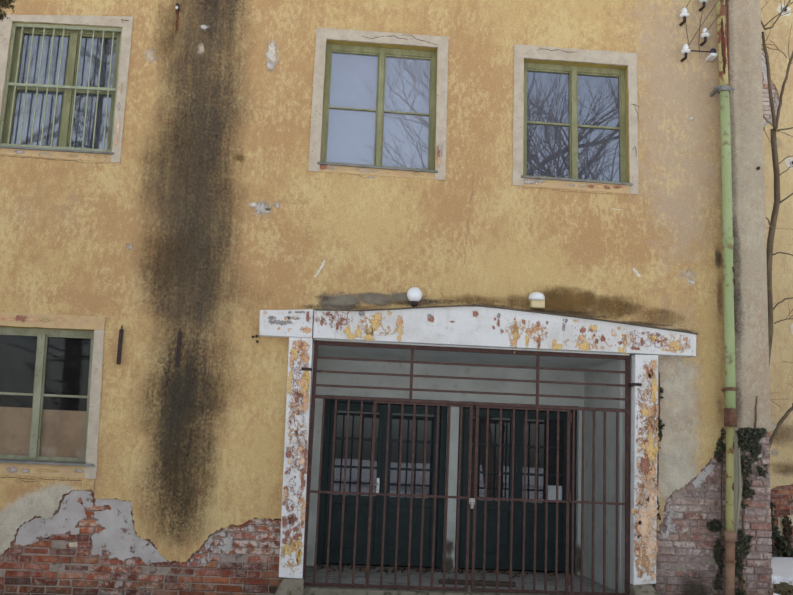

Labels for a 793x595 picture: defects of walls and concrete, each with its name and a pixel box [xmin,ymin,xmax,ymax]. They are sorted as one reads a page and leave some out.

flaking render [761,48,779,130]
flaking render [249,202,279,214]
leakage [143,0,243,506]
leakage [320,293,437,309]
leakage [466,288,667,326]
peeling [492,313,691,355]
flaking render [0,308,404,595]
flaking render [631,359,726,595]
flaking render [734,431,793,595]